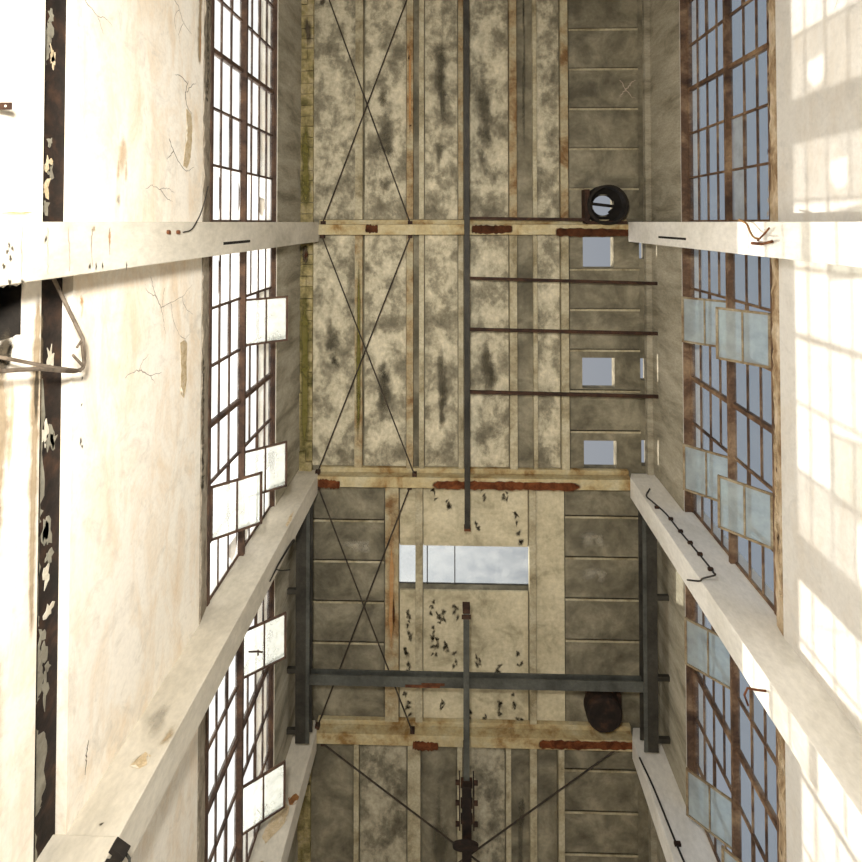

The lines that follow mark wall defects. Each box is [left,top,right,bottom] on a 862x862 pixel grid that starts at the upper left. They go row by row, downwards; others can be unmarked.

peeling [45,8,56,70]
leakage [436,47,445,114]
peeling [43,138,54,216]
crack [146,279,192,338]
crack [125,357,160,383]
leakage [0,345,9,490]
leakage [29,304,41,626]
peeling [0,278,86,712]
rust [433,480,580,491]
peeling [35,729,47,817]
rust [413,741,438,751]
rust [539,740,632,750]